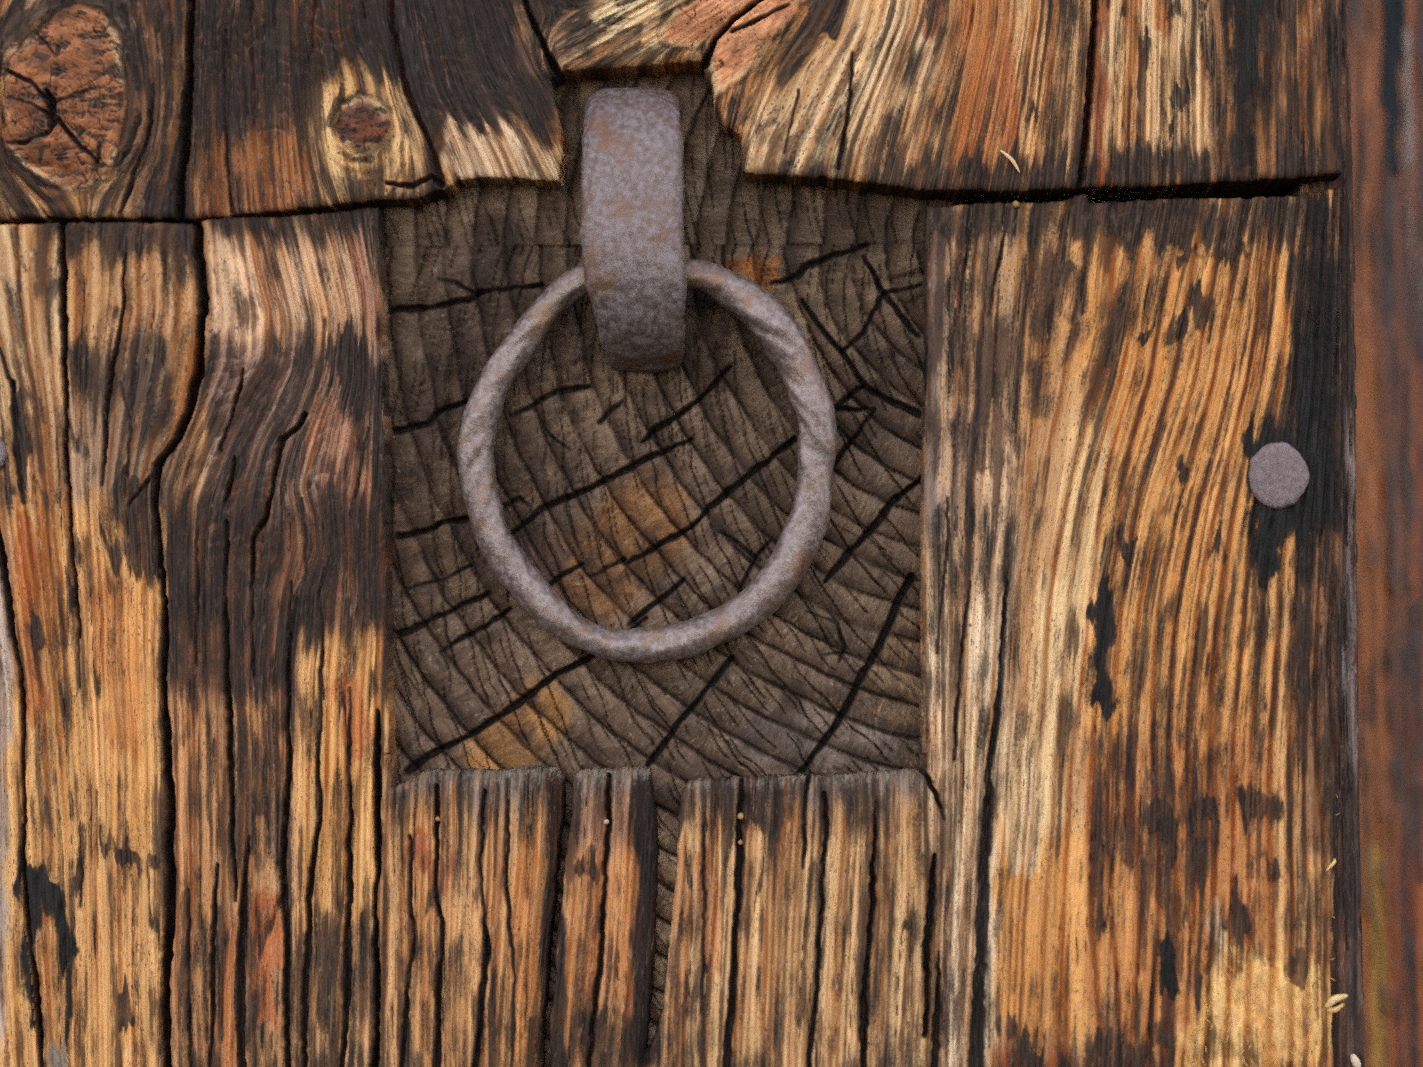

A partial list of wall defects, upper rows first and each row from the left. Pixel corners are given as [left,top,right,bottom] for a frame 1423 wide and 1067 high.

crack [700,0,790,79]
crack [783,88,800,155]
crack [836,52,854,170]
crack [958,207,1010,317]
crack [768,242,923,467]
crack [0,0,735,1067]
crack [547,435,798,594]
crack [795,476,1012,1067]
crack [699,776,746,1067]